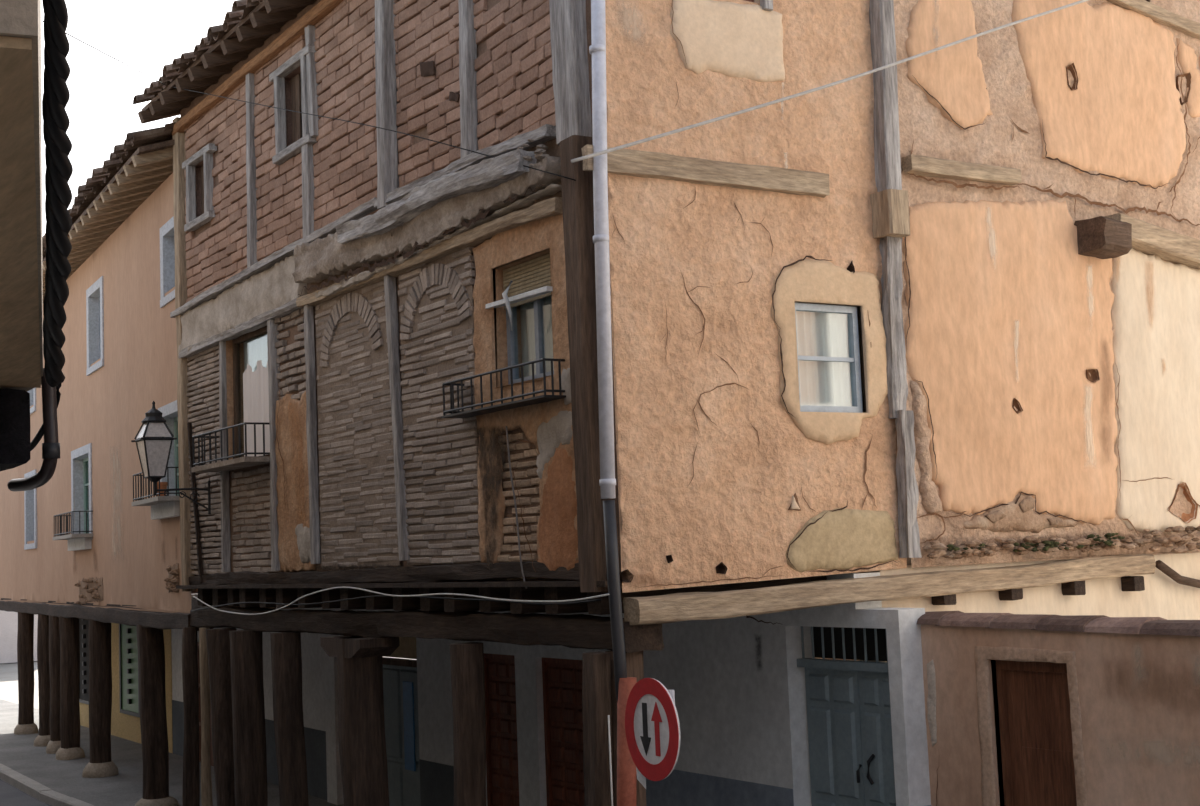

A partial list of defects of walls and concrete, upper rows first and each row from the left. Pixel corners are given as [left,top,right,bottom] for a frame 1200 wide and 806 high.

crack [901,35,1200,228]
spalling [1066,63,1078,90]
spalling [1176,73,1191,105]
flaking render [497,433,579,580]
crack [662,203,832,486]
crack [630,410,896,588]
crack [904,208,937,477]
crack [918,492,1094,543]
flaking render [963,493,1085,533]
spalling [1086,369,1100,383]
crack [1114,356,1200,534]
spalling [1169,482,1198,523]